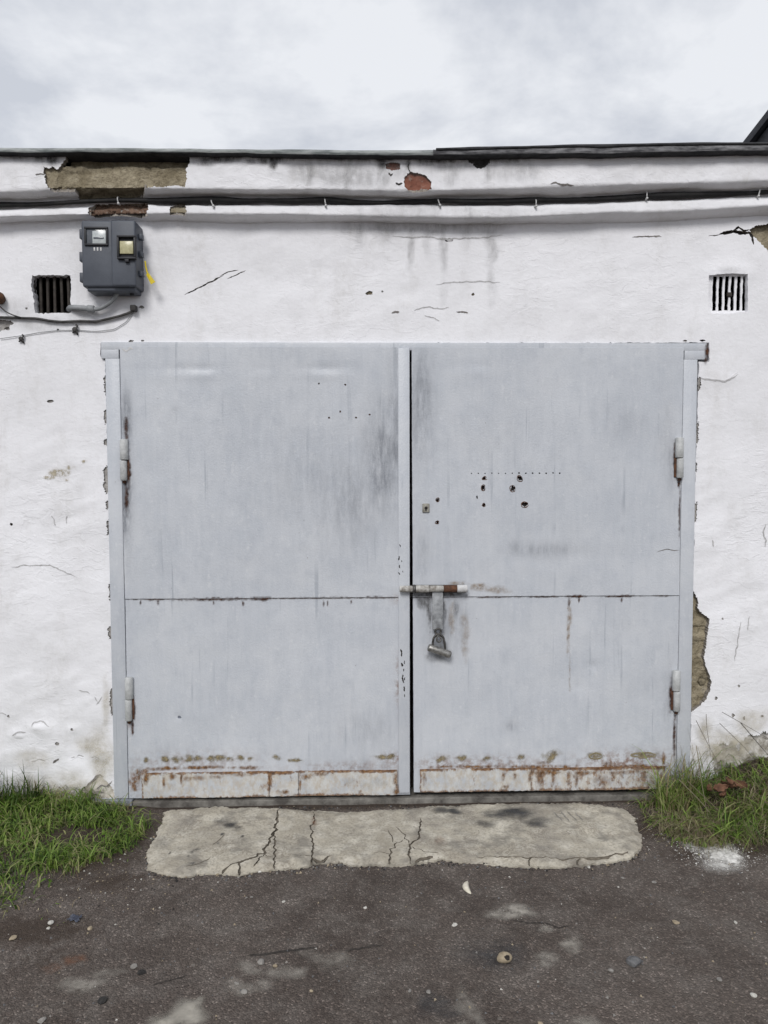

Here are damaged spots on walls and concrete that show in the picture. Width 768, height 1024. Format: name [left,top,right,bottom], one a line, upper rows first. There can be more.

flaking render [43,157,189,218]
flaking render [385,162,432,193]
crack [709,226,754,245]
crack [186,270,246,294]
corrosion [199,596,395,605]
flaking render [691,592,723,712]
corrosion [129,755,255,791]
corrosion [437,756,490,768]
corrosion [503,751,588,788]
crack [222,809,331,875]
crack [376,818,437,864]